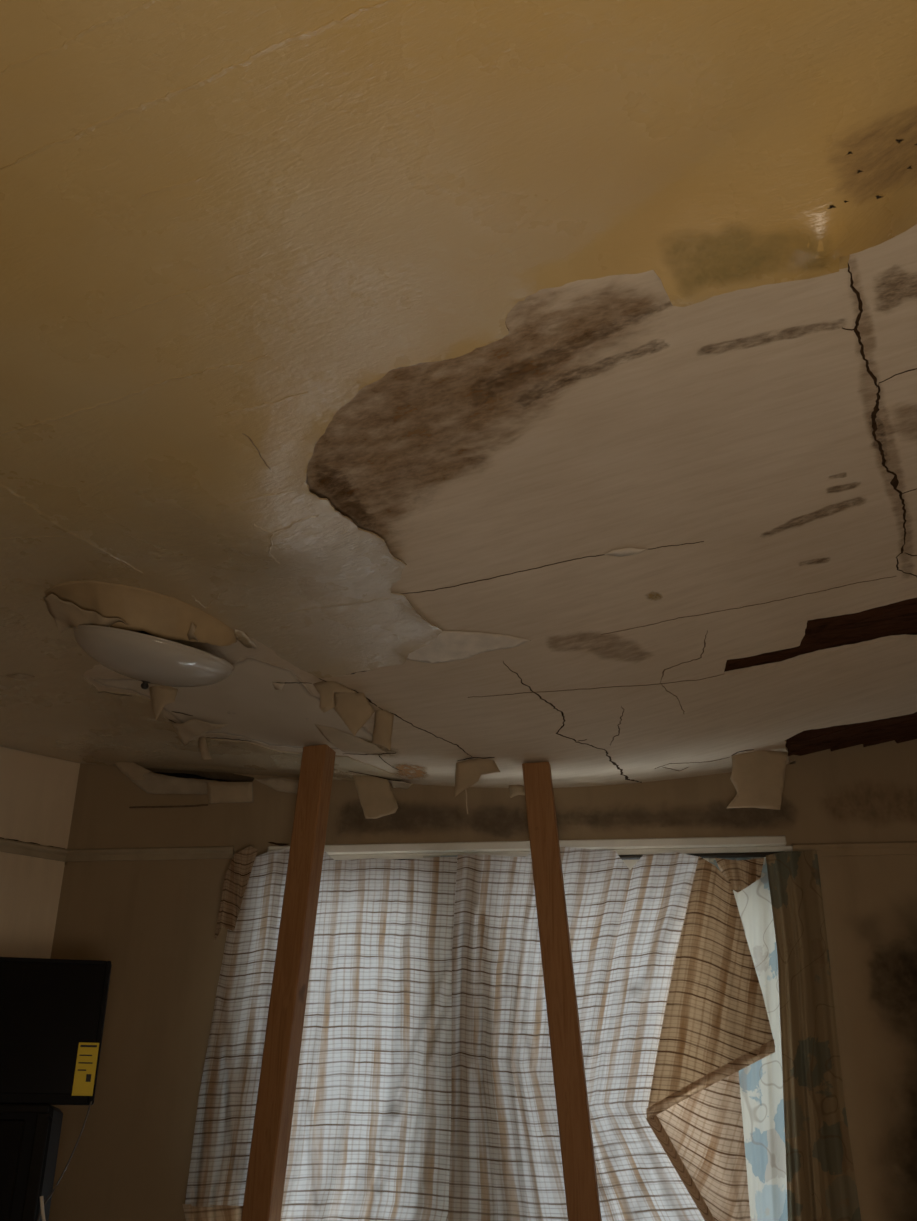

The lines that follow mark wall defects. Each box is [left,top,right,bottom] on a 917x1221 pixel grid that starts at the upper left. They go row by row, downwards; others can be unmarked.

peeling [0,0,758,804]
damp [310,300,650,528]
crack [402,554,604,594]
crack [468,264,917,783]